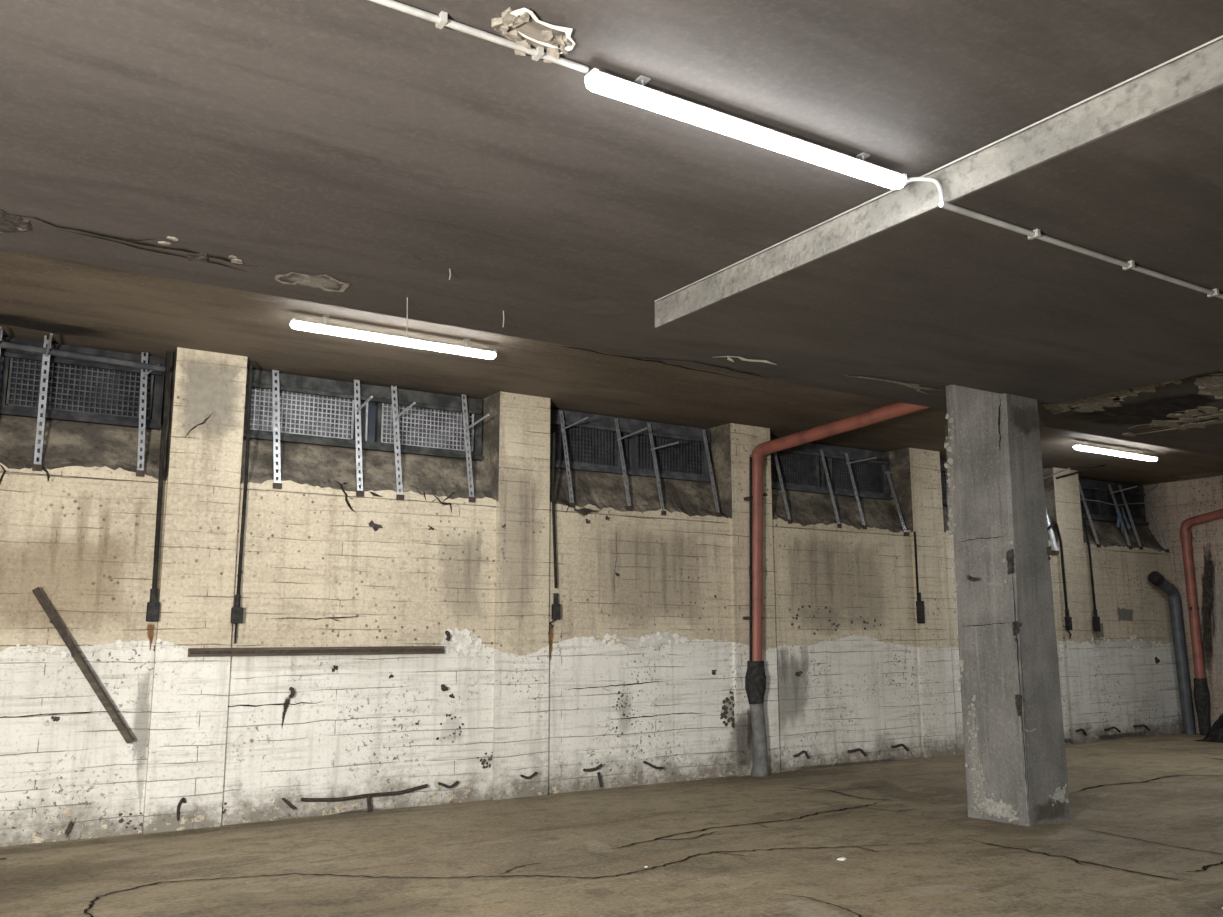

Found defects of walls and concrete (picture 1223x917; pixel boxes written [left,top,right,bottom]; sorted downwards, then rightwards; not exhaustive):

peeling [1042,370,1223,436]
damp [1202,547,1217,670]
crack [1070,758,1223,794]
crack [84,786,1223,917]